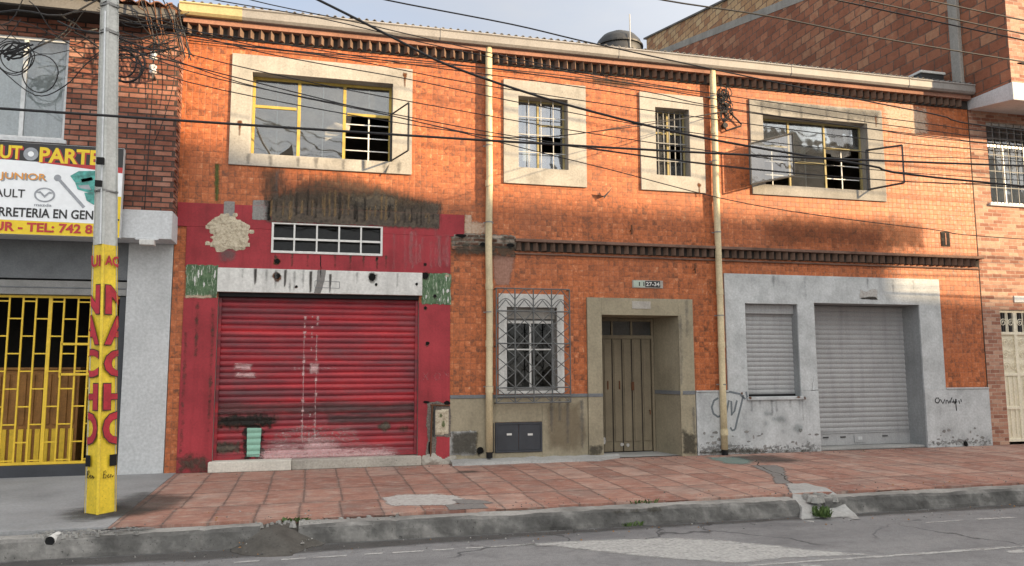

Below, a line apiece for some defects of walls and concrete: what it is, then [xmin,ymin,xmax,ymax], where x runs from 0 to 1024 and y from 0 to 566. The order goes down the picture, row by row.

flaking render [205,213,254,252]
peeling [185,264,218,298]
peeling [262,316,393,459]
crack [751,460,792,484]